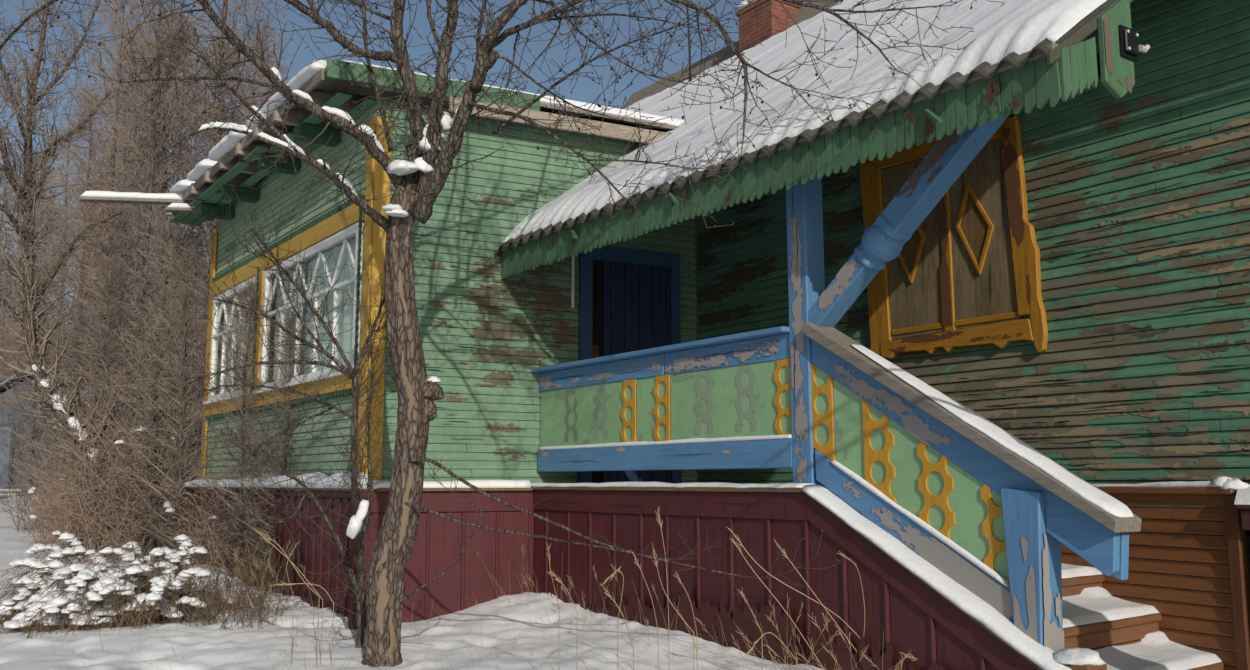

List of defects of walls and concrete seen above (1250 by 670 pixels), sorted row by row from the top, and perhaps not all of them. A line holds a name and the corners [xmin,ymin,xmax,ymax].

peeling [1096,15,1171,131]
peeling [426,227,599,404]
peeling [697,154,869,483]
peeling [884,77,1250,483]
peeling [481,420,537,462]